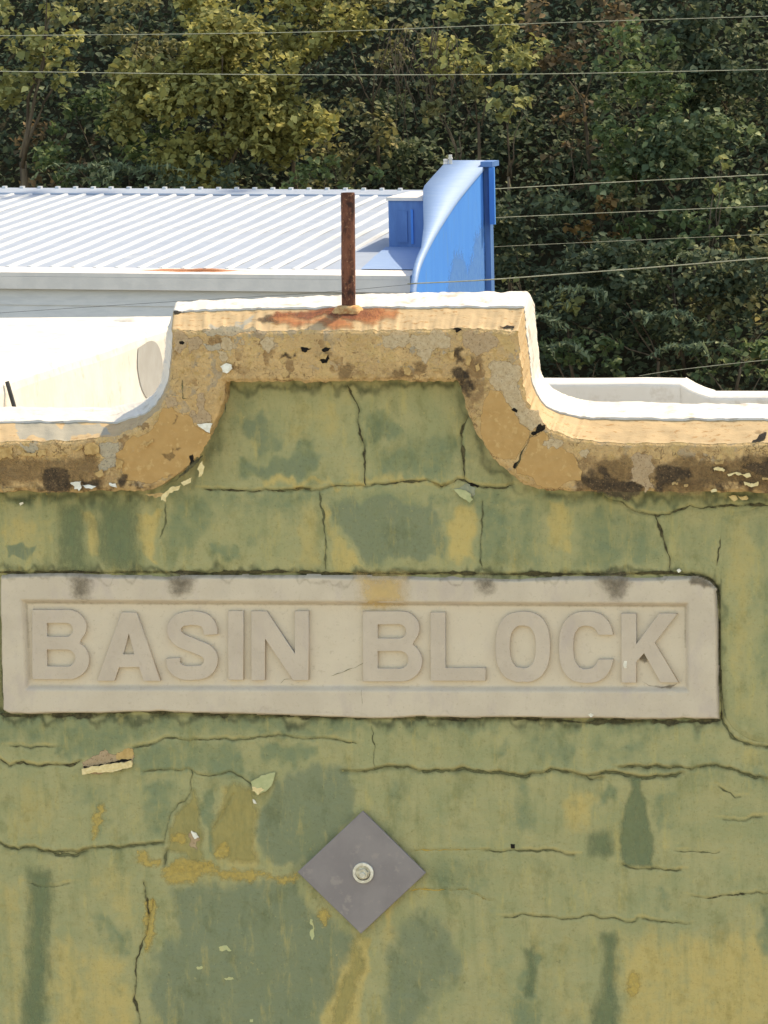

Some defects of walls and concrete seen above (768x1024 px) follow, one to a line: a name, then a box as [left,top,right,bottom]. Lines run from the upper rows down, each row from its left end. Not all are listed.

corrosion [272,307,397,329]
spalling [174,325,275,373]
spalling [61,439,153,491]
crack [146,387,546,569]
spalling [631,452,655,493]
peeling [713,460,768,501]
crack [651,503,768,568]
spalling [82,748,134,775]
crack [310,727,760,821]
water stain [590,778,653,865]
crack [0,842,167,864]
water stain [593,936,616,1024]